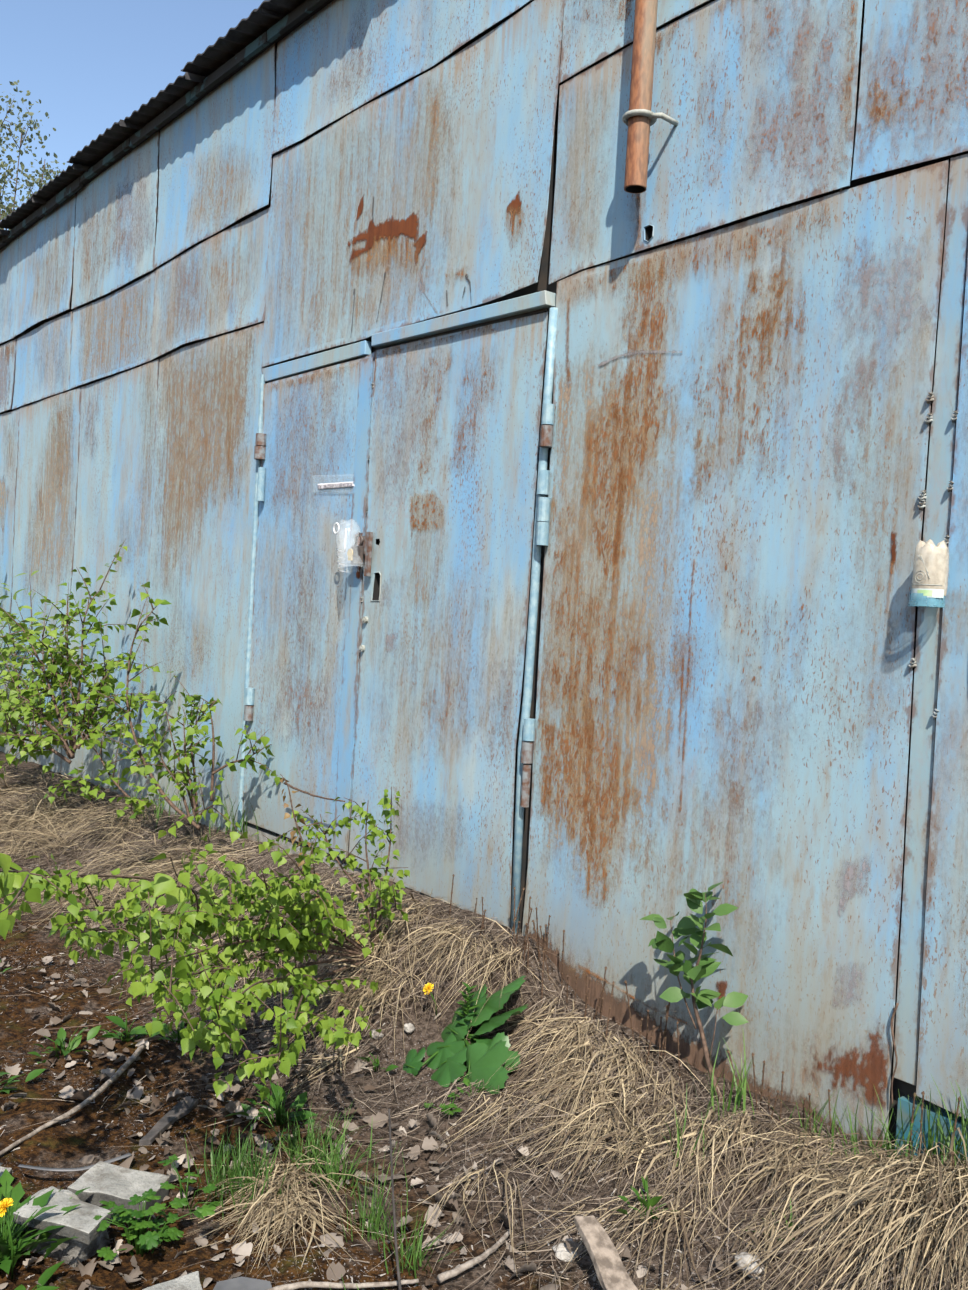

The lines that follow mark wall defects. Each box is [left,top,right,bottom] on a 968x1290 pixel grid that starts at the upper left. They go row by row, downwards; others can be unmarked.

rust [869,83,901,128]
rust [279,89,447,340]
rust [506,191,522,240]
rust [27,197,252,675]
rust [410,357,451,602]
rust [453,358,494,470]
rust [791,1032,887,1130]